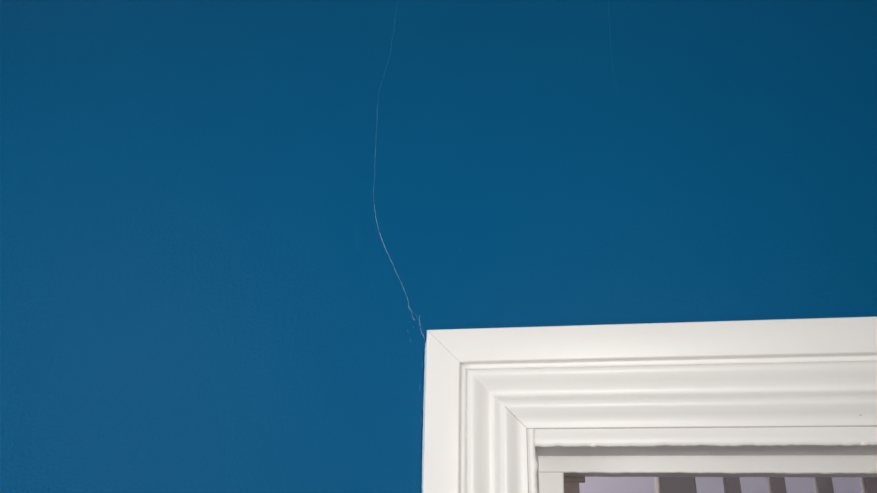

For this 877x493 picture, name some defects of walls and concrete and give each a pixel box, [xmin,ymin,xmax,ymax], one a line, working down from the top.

crack [373,0,458,360]